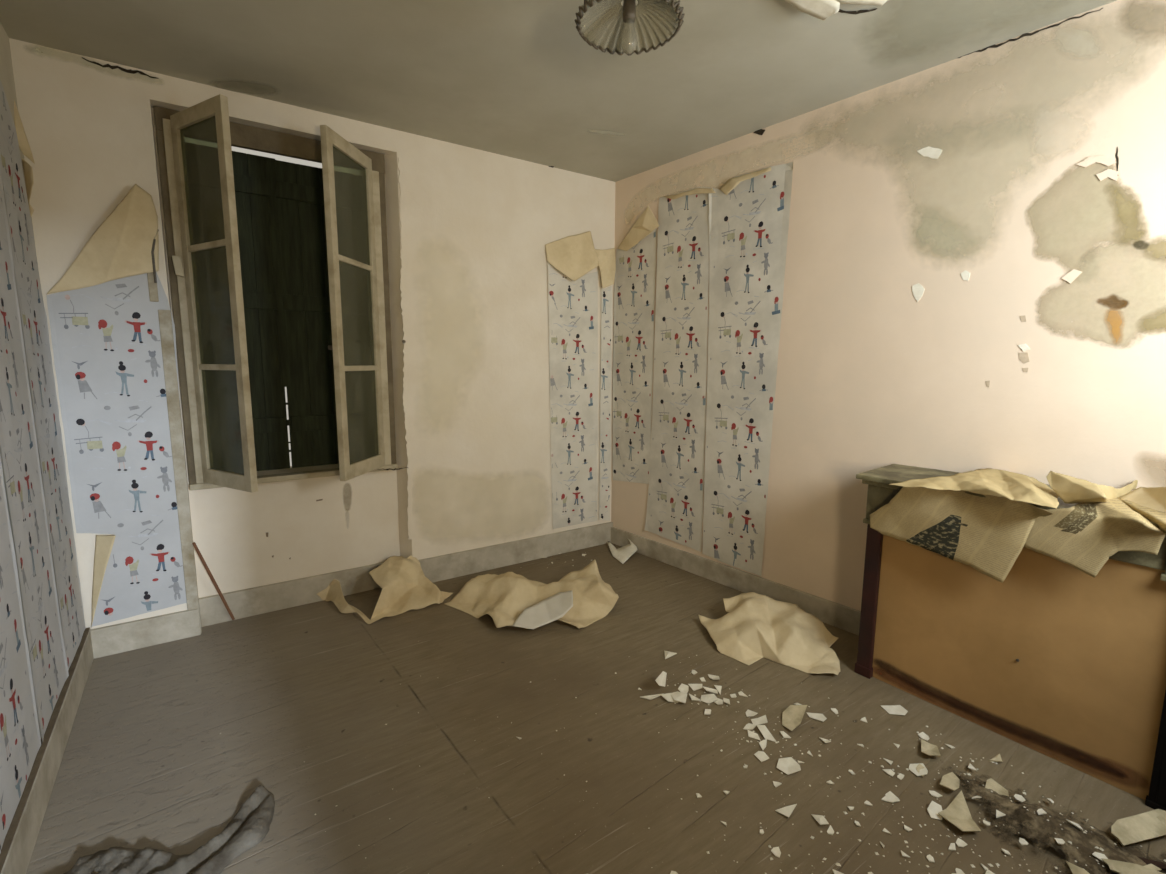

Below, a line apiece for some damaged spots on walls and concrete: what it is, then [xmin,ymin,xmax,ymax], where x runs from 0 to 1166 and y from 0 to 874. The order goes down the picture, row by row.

peeling [785,0,888,21]
damp [927,42,1089,227]
damp [1027,156,1166,347]